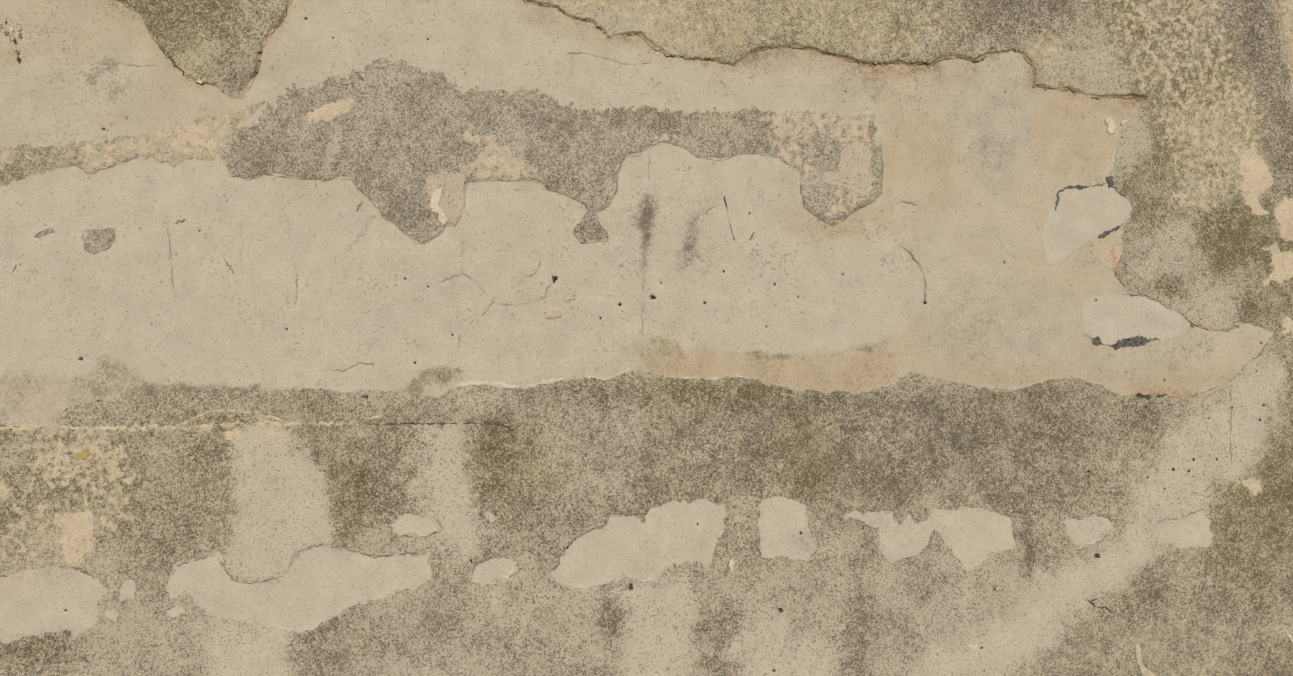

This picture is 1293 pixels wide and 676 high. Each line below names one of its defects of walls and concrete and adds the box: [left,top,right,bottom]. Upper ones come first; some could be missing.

peeling [0,0,1274,428]
peeling [0,563,136,643]
peeling [166,514,443,632]
peeling [469,555,517,586]
peeling [550,498,727,590]
peeling [756,496,817,561]
peeling [843,505,1016,571]
peeling [1062,512,1114,558]
peeling [1154,509,1216,549]
flaking render [1135,644,1155,676]